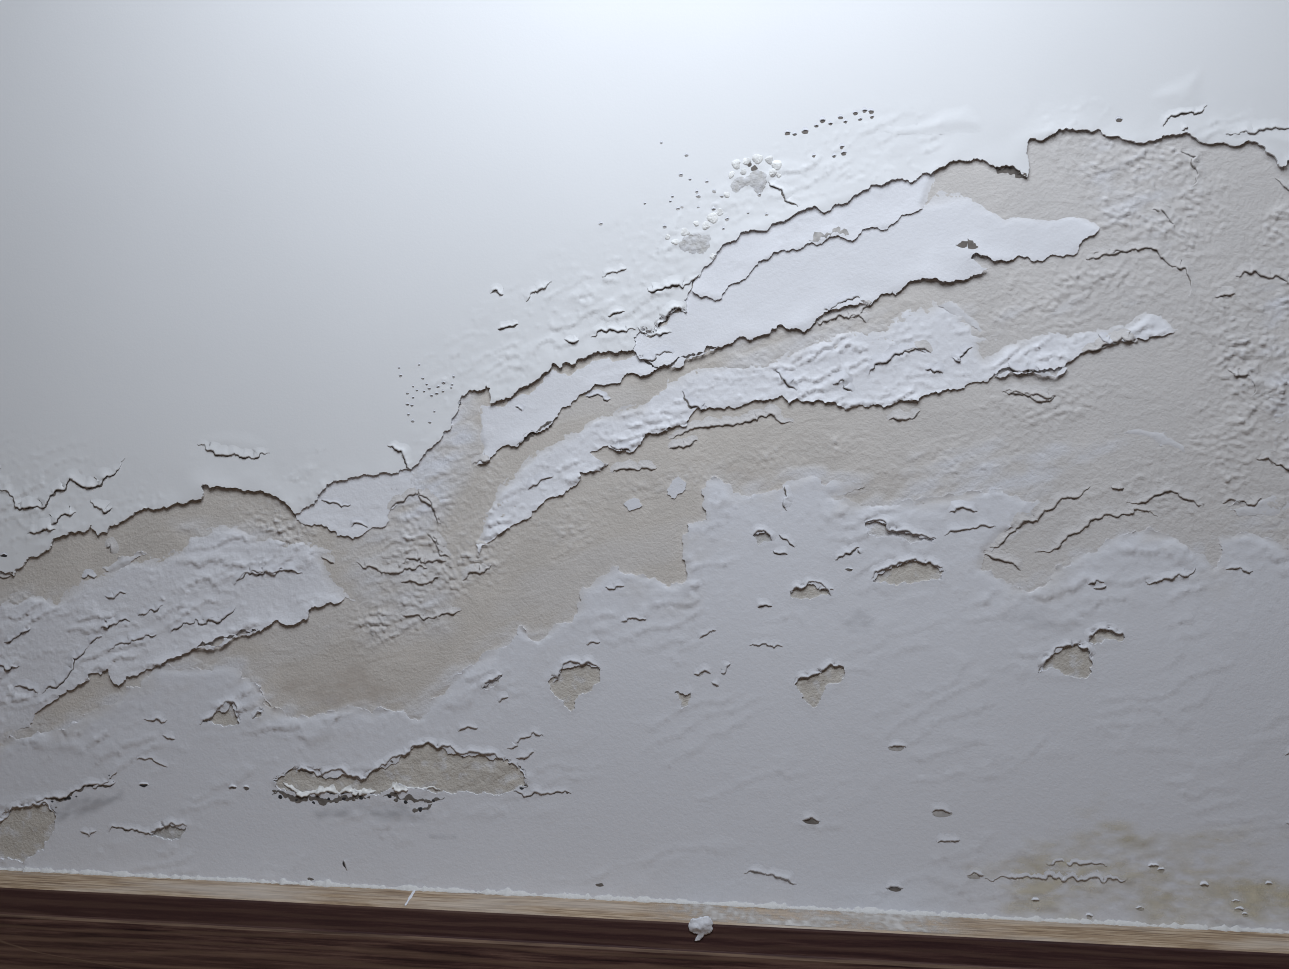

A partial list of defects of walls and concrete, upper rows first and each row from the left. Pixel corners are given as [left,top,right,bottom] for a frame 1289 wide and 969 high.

peeling [784,107,874,136]
flaking render [0,116,1289,746]
spalling [887,739,908,751]
flaking render [272,737,530,813]
flaking render [0,798,57,862]
flaking render [150,816,188,840]
spalling [801,810,820,824]
spalling [930,802,953,817]
spalling [886,879,903,892]